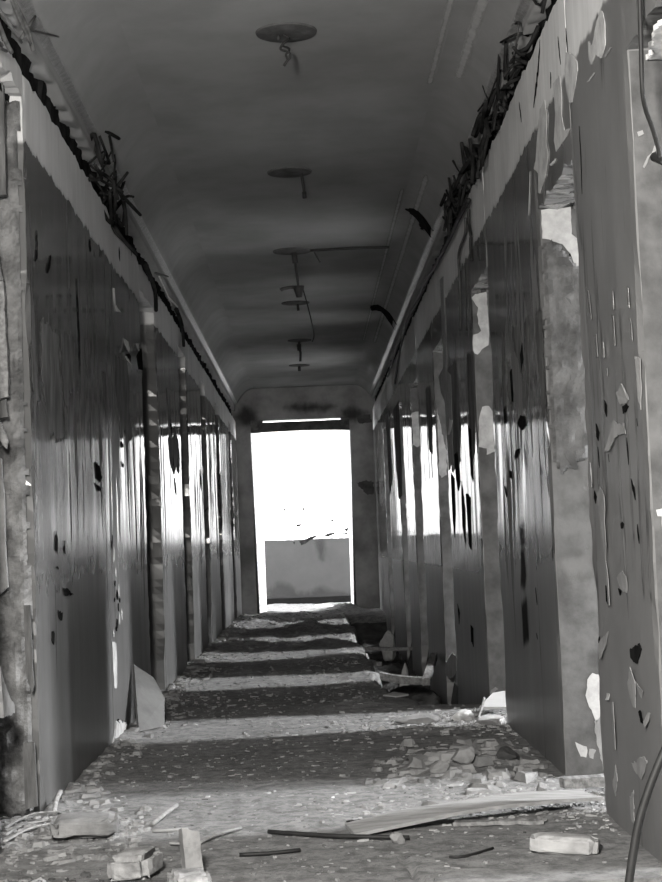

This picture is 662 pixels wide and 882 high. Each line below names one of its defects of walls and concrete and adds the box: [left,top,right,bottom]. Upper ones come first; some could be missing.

flaking render [646,19,662,60]
spalling [405,208,433,237]
spalling [370,305,397,330]
flaking render [0,100,90,817]
peeling [102,338,143,448]
peeling [167,387,180,474]
peeling [385,400,402,499]
flaking render [411,207,642,607]
flaking render [575,673,616,764]
peeling [627,643,651,727]
flaking render [632,756,647,779]